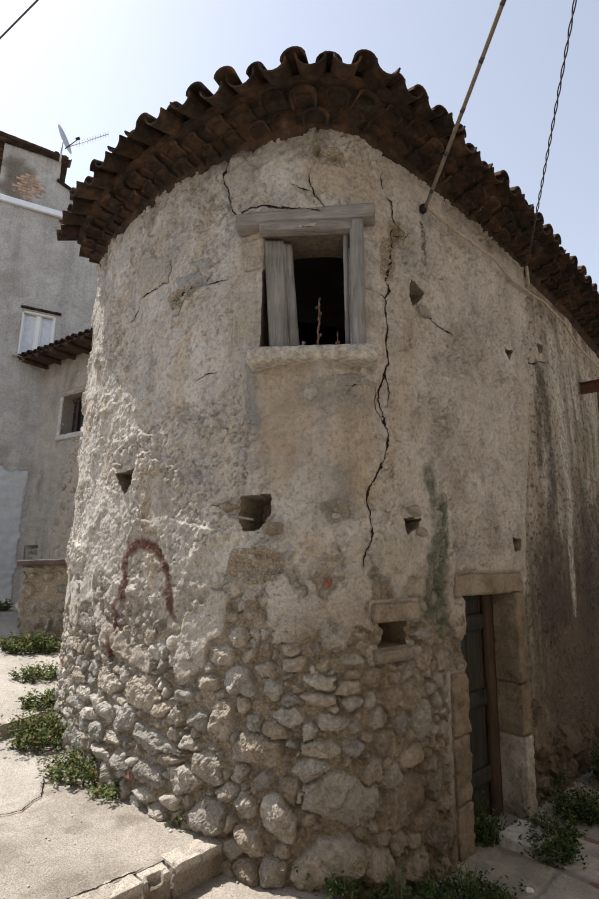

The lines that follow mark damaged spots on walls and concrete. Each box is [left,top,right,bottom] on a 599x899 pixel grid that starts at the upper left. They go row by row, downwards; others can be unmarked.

spalling [12,173,45,202]
crack [222,160,324,215]
crack [347,173,409,566]
spalling [49,437,80,559]
spalling [320,498,352,524]
spalling [54,545,467,899]
spalling [530,693,599,807]